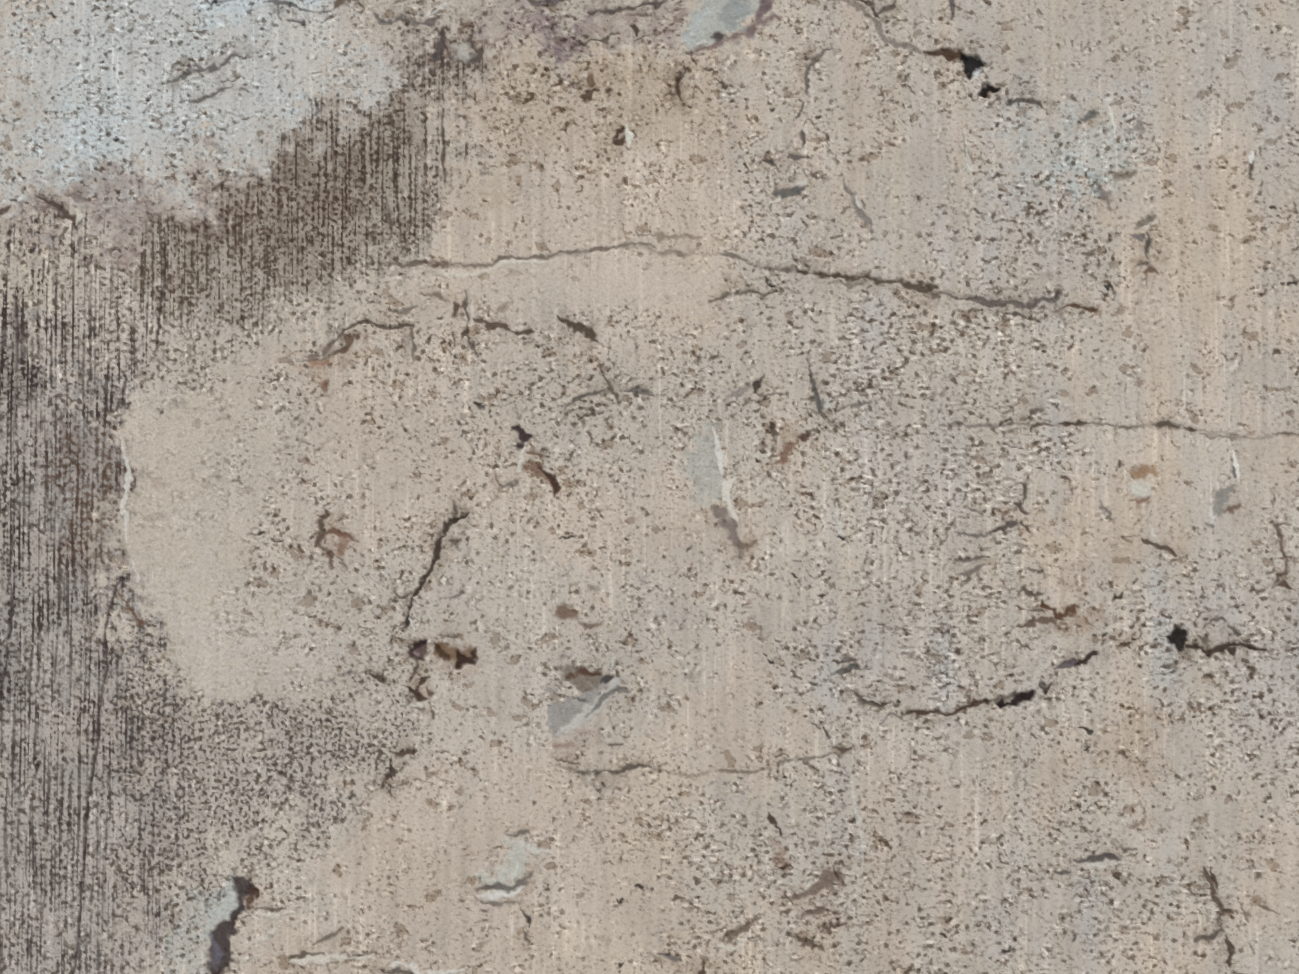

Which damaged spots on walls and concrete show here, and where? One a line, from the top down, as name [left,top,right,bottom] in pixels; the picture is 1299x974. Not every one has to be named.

spalling [679,0,803,66]
crack [780,38,837,158]
crack [795,0,1059,119]
crack [296,230,1104,440]
water stain [0,0,693,974]
crack [363,486,478,689]
crack [547,394,1299,795]
spalling [154,862,268,974]
crack [1175,860,1283,974]